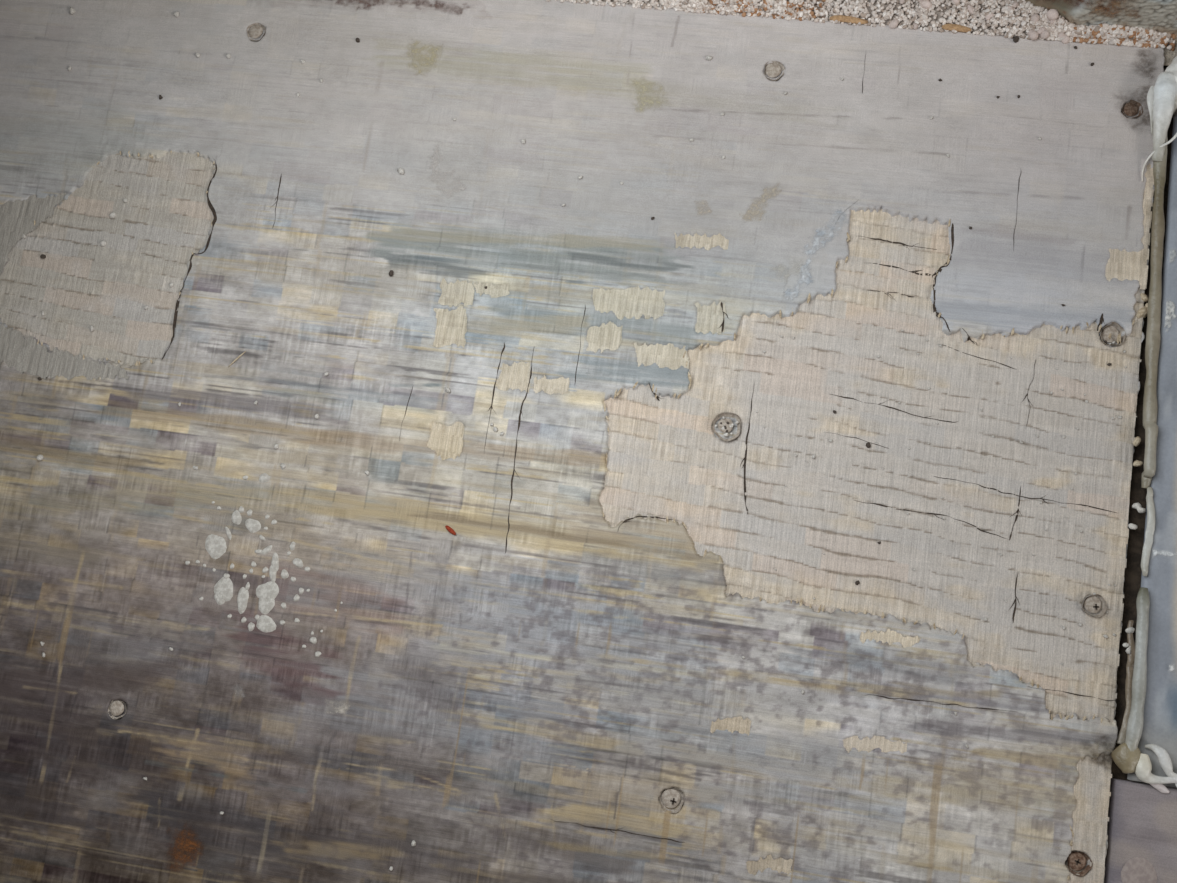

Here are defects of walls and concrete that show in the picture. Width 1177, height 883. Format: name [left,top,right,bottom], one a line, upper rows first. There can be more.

rust [1053,0,1139,17]
peeling [0,151,216,381]
peeling [474,282,509,298]
peeling [496,362,570,395]
peeling [427,422,465,460]
crack [484,343,534,553]
crack [740,387,754,514]
peeling [586,163,1154,723]
crack [1008,574,1020,623]